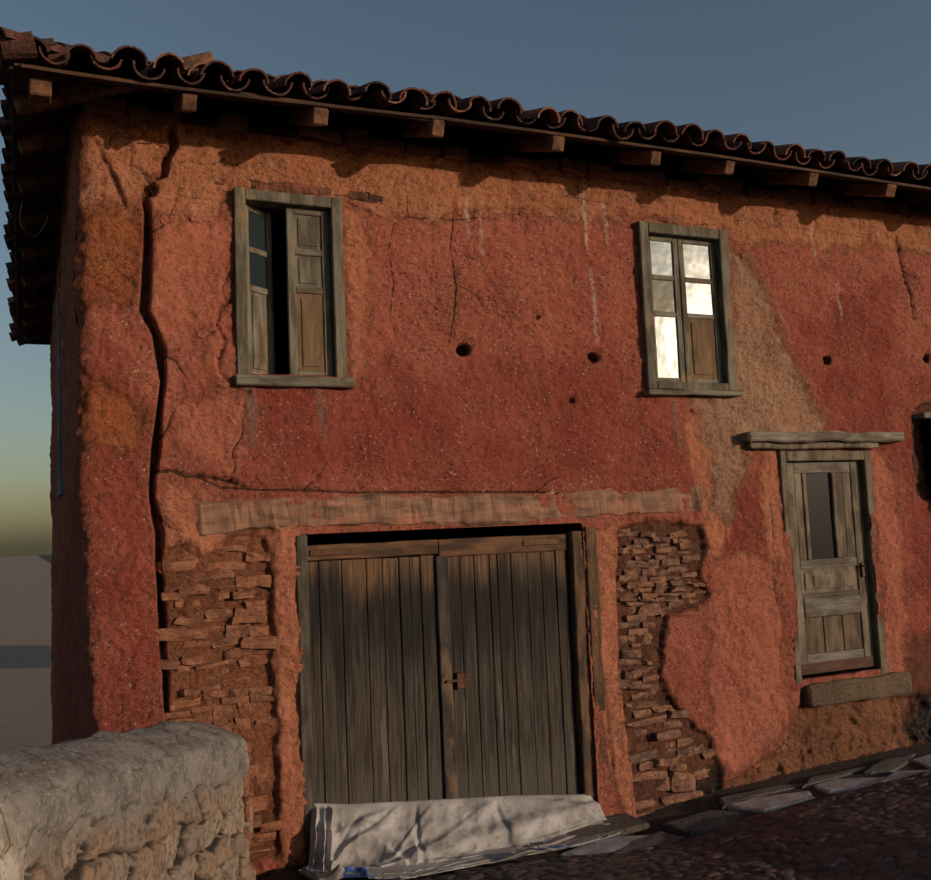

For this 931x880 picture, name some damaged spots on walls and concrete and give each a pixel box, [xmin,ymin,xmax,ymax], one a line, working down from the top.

crack [95,129,564,713]
peeling [73,114,931,479]
crack [736,217,930,321]
spalling [155,529,282,863]
spalling [615,402,931,817]
leakage [903,639,931,745]